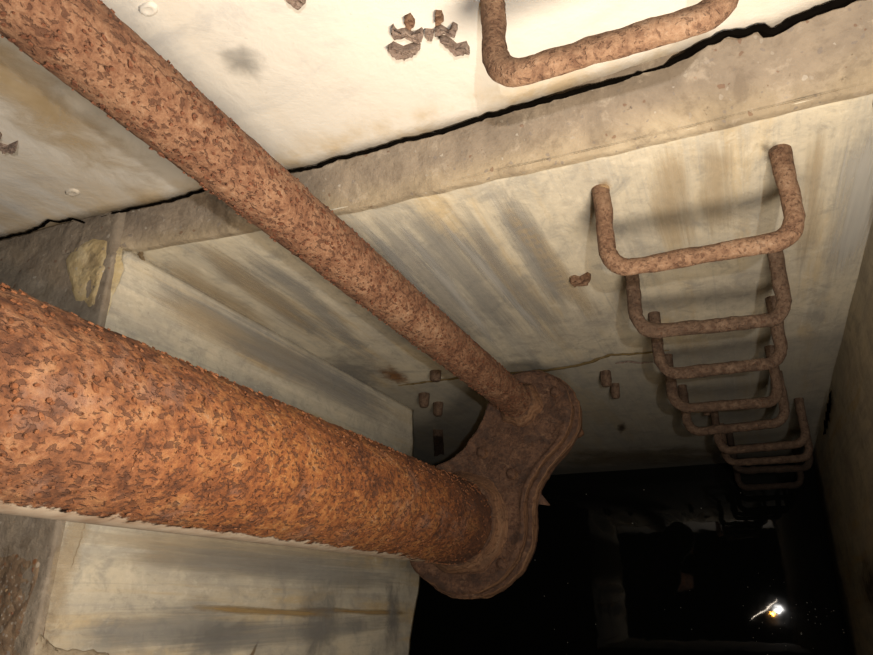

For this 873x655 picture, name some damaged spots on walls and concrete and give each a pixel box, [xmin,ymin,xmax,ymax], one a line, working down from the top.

crack [288,0,858,173]
crack [0,189,206,240]
rust [91,81,530,417]
spalling [0,554,40,655]
spalling [34,628,108,655]